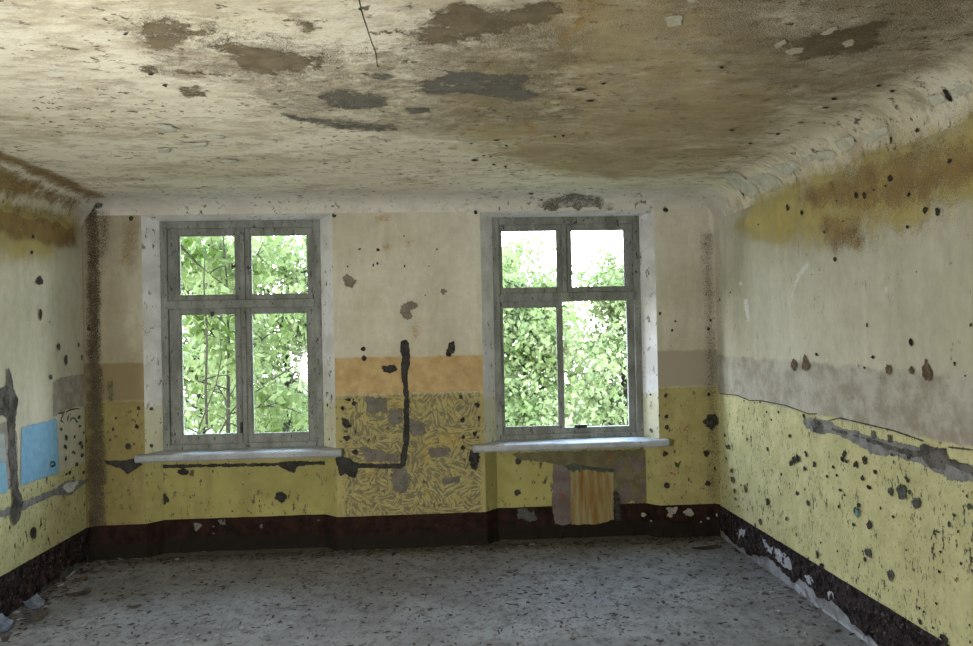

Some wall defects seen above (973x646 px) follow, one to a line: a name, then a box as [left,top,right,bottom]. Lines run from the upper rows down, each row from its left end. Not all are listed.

crack [358,0,378,65]
damp [66,0,973,297]
damp [0,148,145,527]
peeling [0,343,86,517]
peeling [340,396,426,493]
peeling [428,402,481,471]
peeling [513,449,652,525]
peeling [762,538,792,570]
peeling [780,451,816,476]
spalling [852,503,872,529]
peeling [802,414,973,510]
peeling [794,575,878,646]